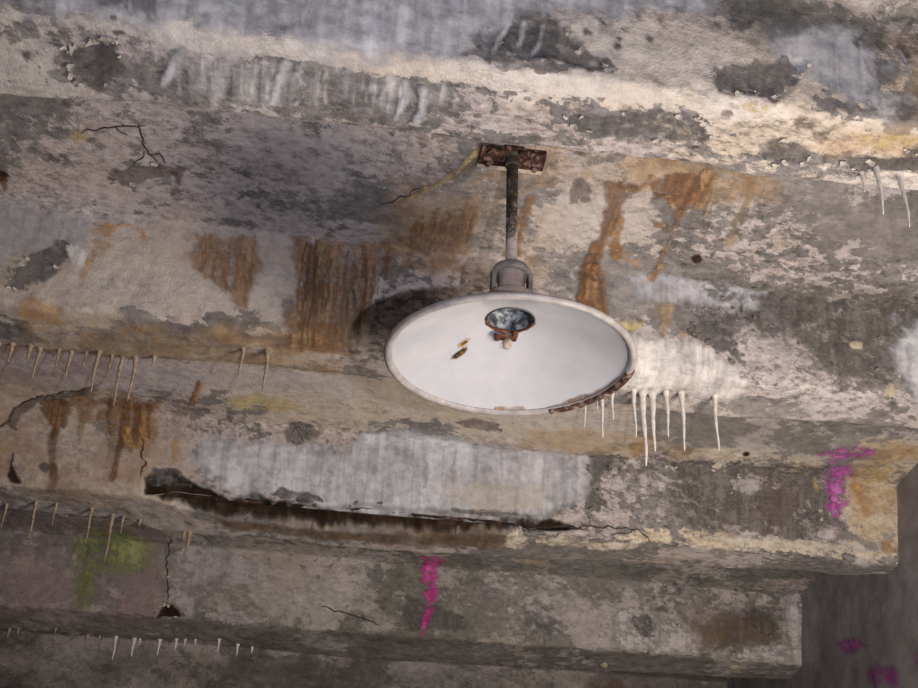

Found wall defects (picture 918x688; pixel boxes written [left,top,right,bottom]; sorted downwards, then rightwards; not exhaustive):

peeling [59,31,125,92]
water stain [23,0,706,64]
peeling [490,18,620,74]
peeling [711,56,814,104]
crack [81,125,166,165]
corrosion [577,170,718,314]
corrosion [279,236,393,354]
water stain [621,274,918,400]
corrosion [42,398,72,487]
corrosion [97,392,158,481]
water stain [194,429,590,521]
spalling [145,468,642,551]